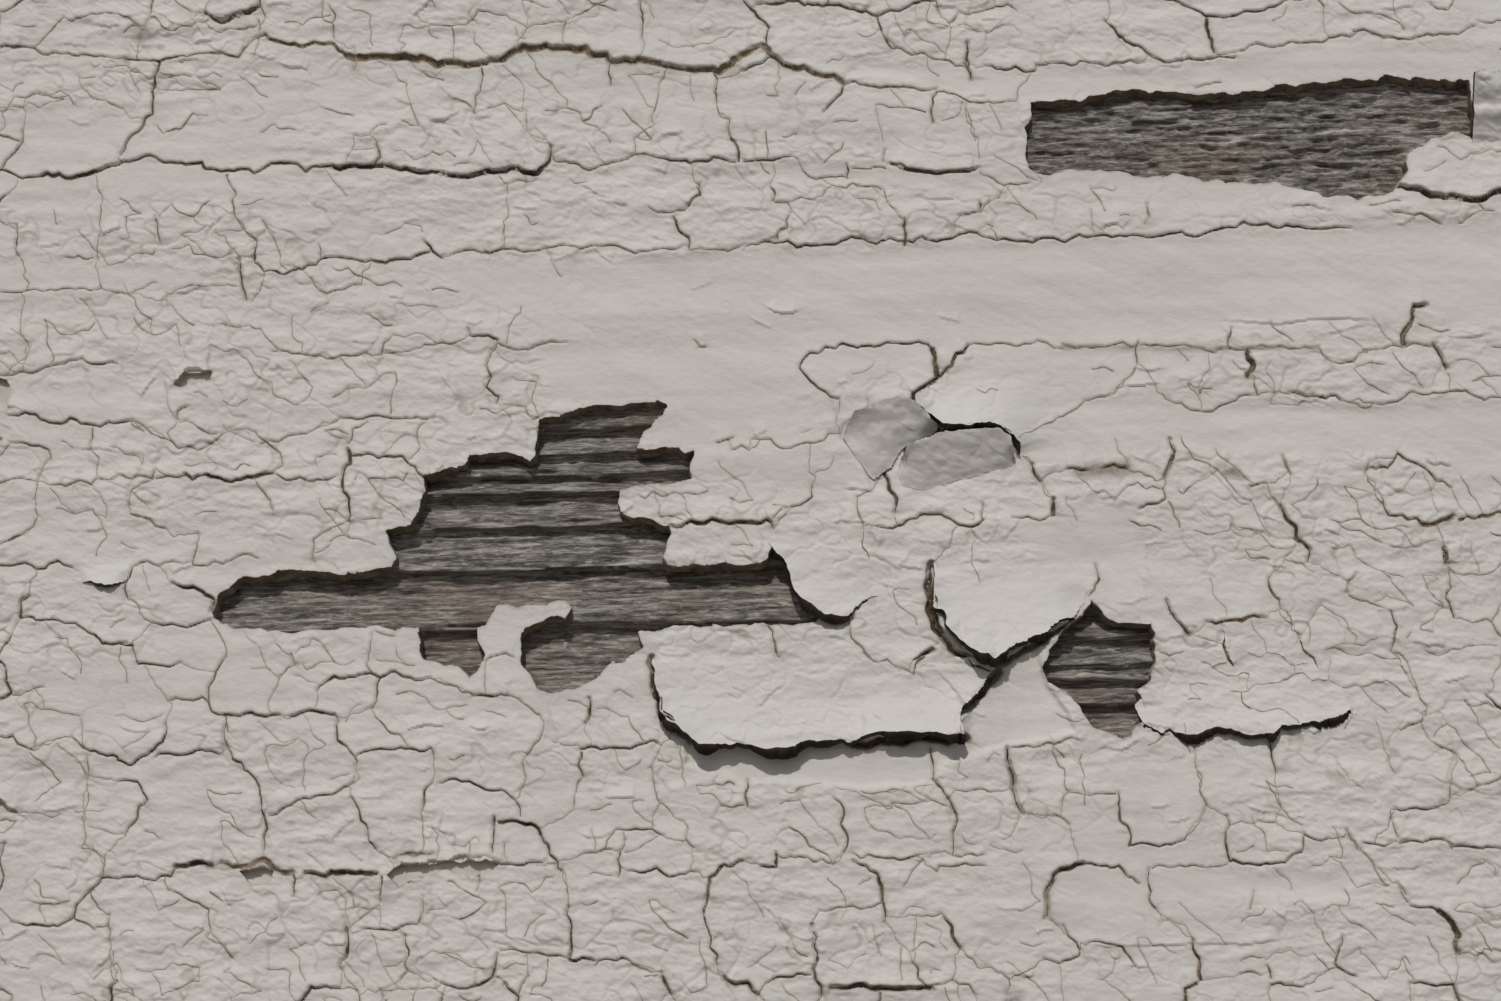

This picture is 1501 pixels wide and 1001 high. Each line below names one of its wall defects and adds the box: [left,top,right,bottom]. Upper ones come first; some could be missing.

crack [0,0,1474,301]
peeling [1024,69,1501,200]
crack [1397,186,1501,225]
peeling [0,378,11,411]
crack [0,412,430,562]
crack [672,489,813,528]
peeling [212,400,1351,760]
crack [751,305,1501,562]
crack [1376,453,1501,618]
crack [0,533,561,1001]
crack [577,565,1100,1001]
crack [1045,793,1501,967]